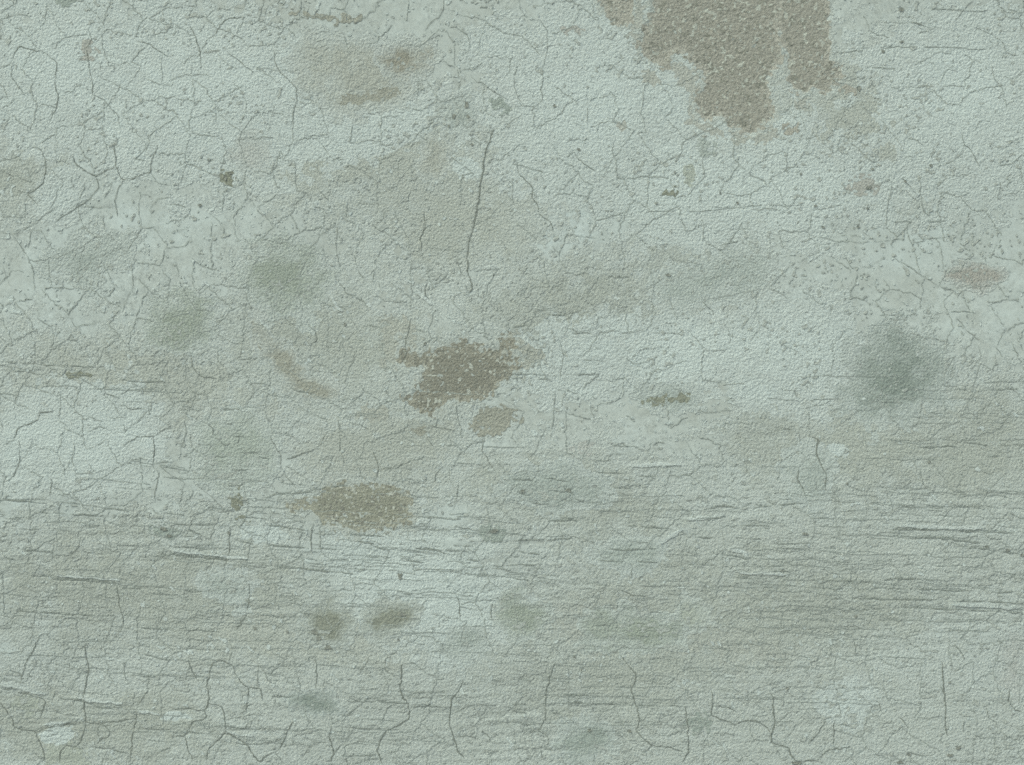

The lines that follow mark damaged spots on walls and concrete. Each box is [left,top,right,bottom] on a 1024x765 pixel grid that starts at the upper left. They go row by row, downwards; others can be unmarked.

spalling [592,0,862,146]
crack [892,0,1024,107]
crack [715,88,814,211]
crack [550,64,760,385]
crack [771,205,861,299]
crack [833,257,884,300]
crack [875,174,1024,459]
crack [0,0,657,765]
spalling [391,327,547,437]
crack [530,347,748,461]
spalling [277,471,429,542]
crack [430,397,1024,765]